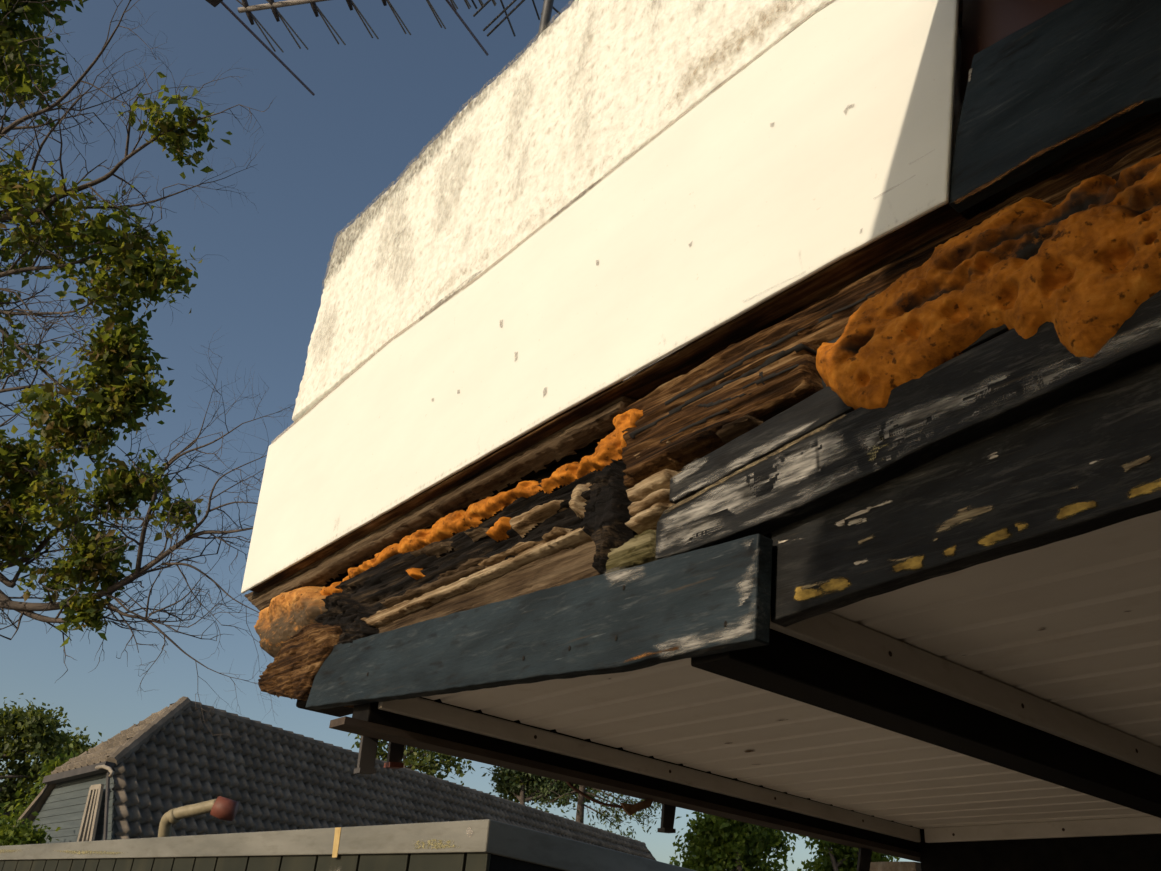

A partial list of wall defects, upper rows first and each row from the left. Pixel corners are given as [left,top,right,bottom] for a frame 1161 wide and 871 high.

peeling [1123,455,1151,471]
peeling [836,501,891,527]
peeling [933,506,993,541]